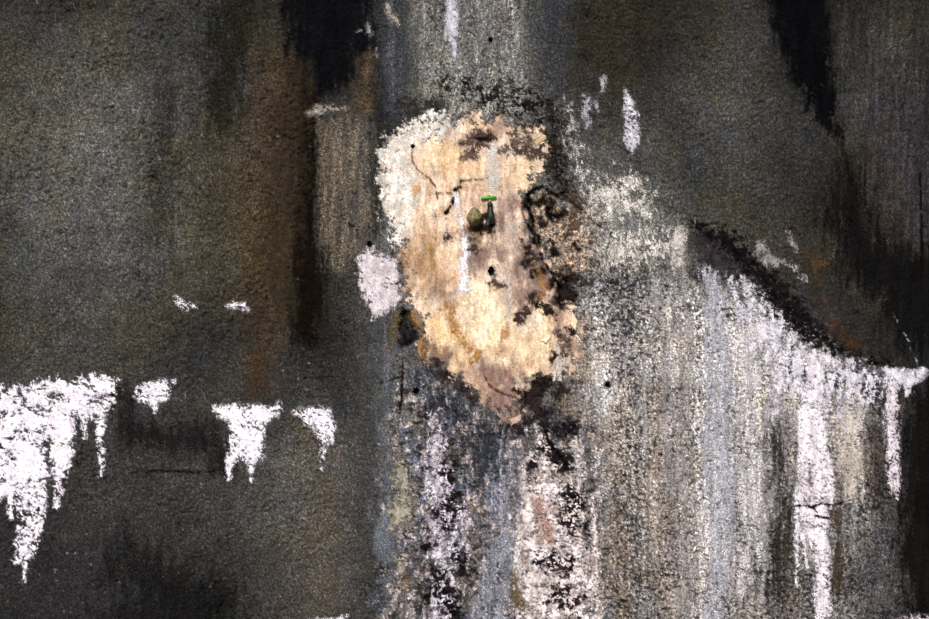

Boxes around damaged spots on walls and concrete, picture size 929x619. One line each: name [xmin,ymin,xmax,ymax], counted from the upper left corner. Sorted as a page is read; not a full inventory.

damp [198,0,255,141]
crack [411,149,488,239]
spalling [374,108,585,425]
damp [280,0,929,619]
damp [0,372,337,583]